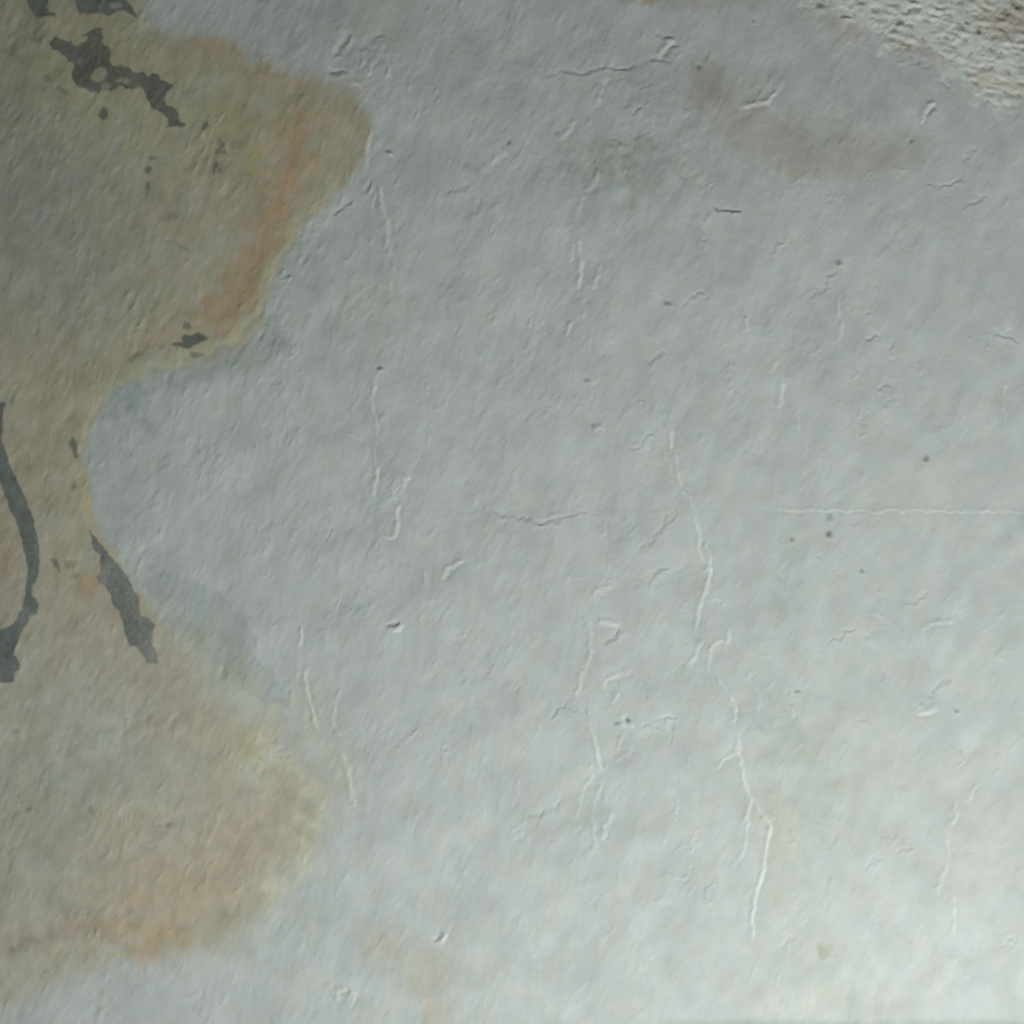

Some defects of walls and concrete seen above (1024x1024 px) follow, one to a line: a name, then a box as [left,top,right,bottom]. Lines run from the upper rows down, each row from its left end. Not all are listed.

water stain [676,47,936,195]
water stain [0,0,378,1017]
crack [665,426,773,938]